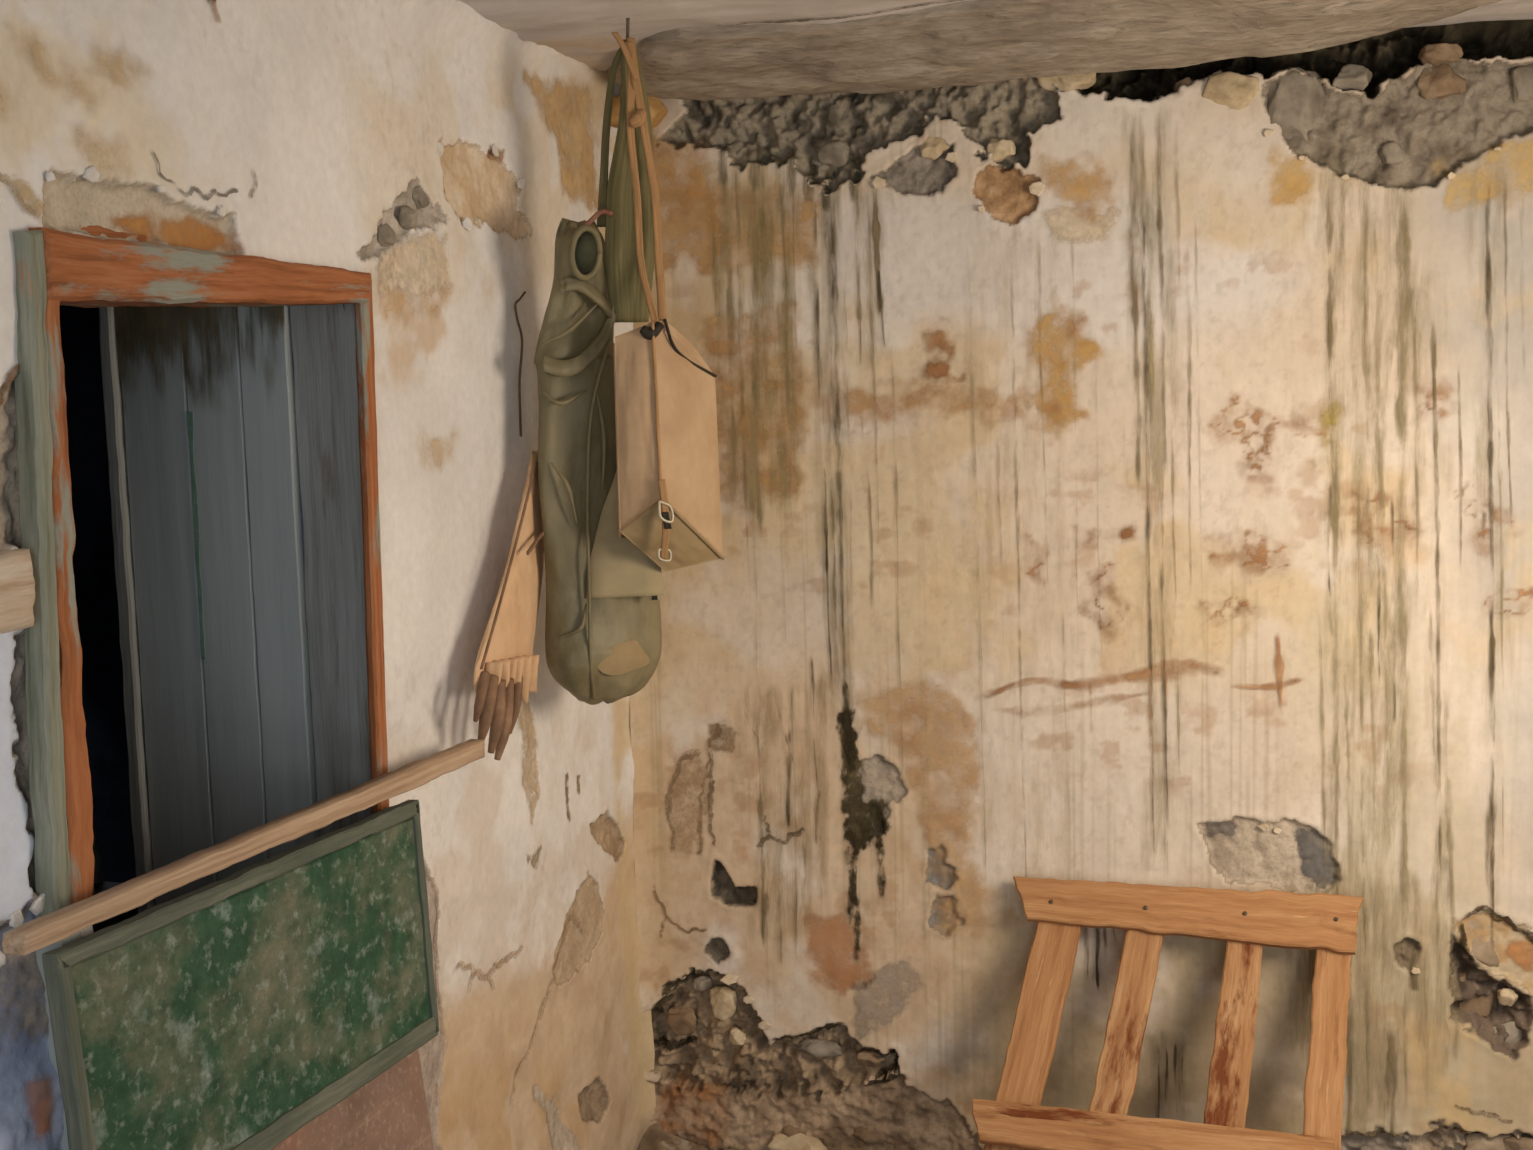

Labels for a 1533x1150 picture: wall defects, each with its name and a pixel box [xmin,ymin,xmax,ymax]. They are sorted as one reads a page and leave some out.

peeling [356,140,532,260]
leakage [662,77,1061,264]
leakage [857,201,884,384]
leakage [1132,164,1191,485]
spalling [1036,19,1533,189]
leakage [1397,212,1436,436]
leakage [786,479,889,960]
leakage [1490,574,1503,694]
peeling [0,631,64,1150]
spalling [1197,816,1341,894]
spalling [647,938,982,1150]
spalling [1449,911,1533,1060]